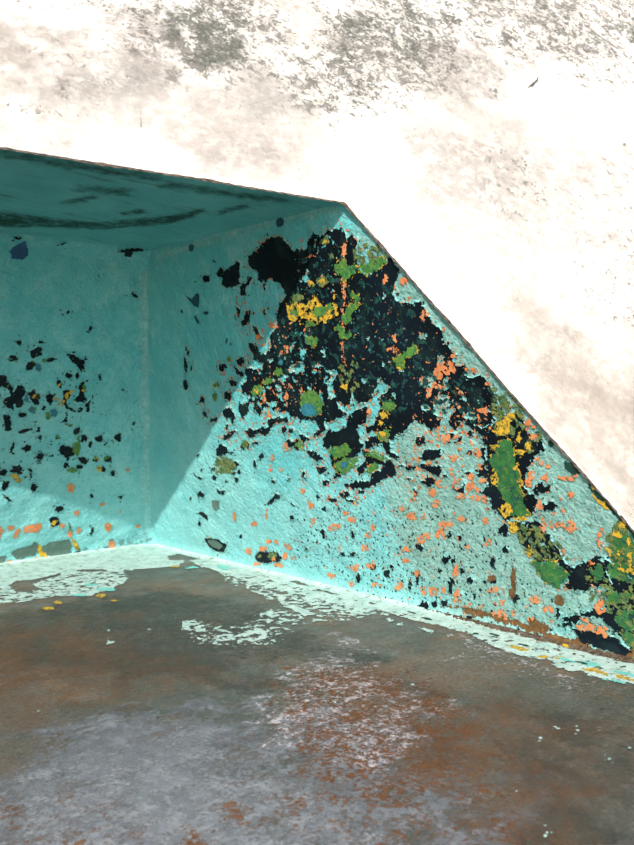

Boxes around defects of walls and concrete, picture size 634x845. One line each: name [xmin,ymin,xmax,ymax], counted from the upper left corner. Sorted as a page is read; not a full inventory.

peeling [0,147,634,684]
corrosion [173,824,223,845]
corrosion [219,663,600,845]